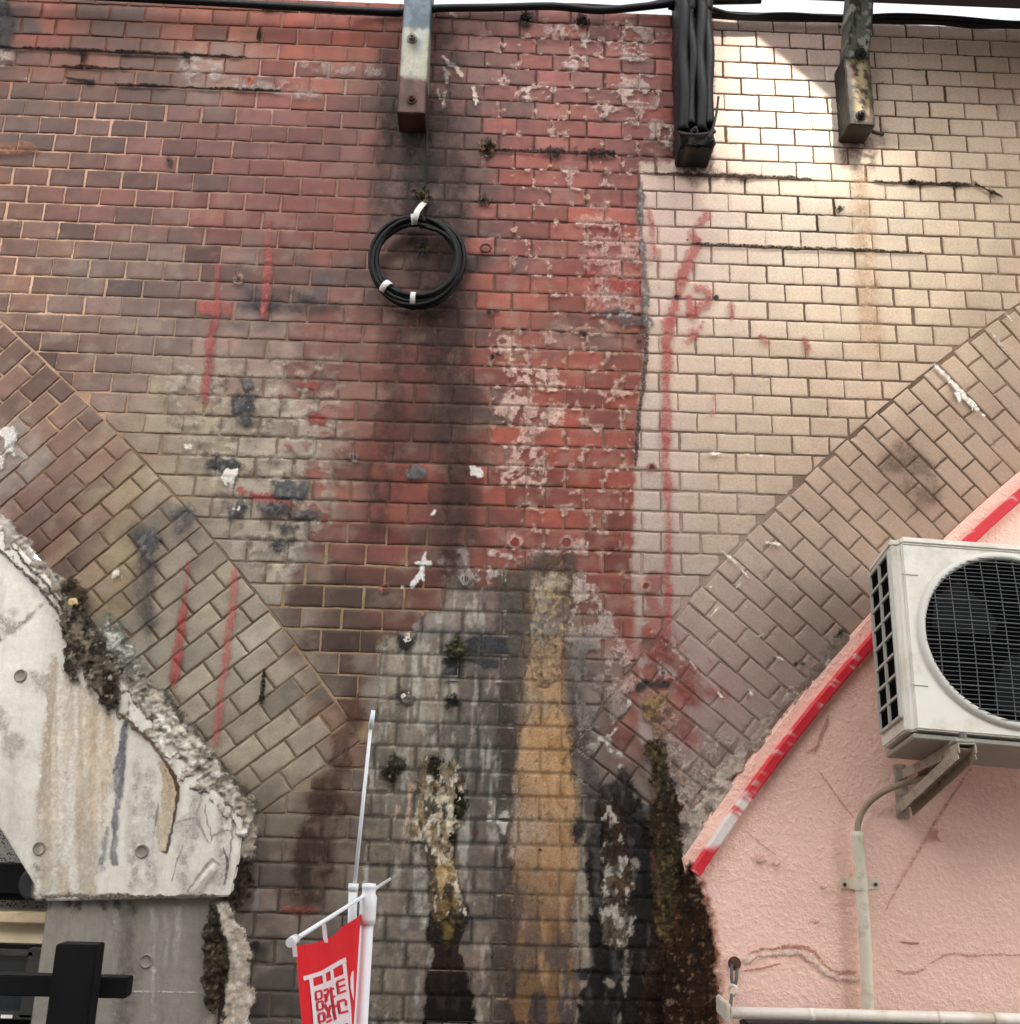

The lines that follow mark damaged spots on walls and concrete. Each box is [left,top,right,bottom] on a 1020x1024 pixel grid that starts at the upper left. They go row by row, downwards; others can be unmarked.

crack [0,9,286,92]
efflorescence [181,56,318,98]
water stain [251,221,337,317]
crack [559,171,812,466]
crack [691,242,923,253]
crack [873,179,1003,197]
peeling [489,238,639,556]
peeling [0,513,66,608]
water stain [290,13,723,1024]
peeling [94,612,258,860]
rust [487,569,580,1024]
peeling [216,902,256,1024]